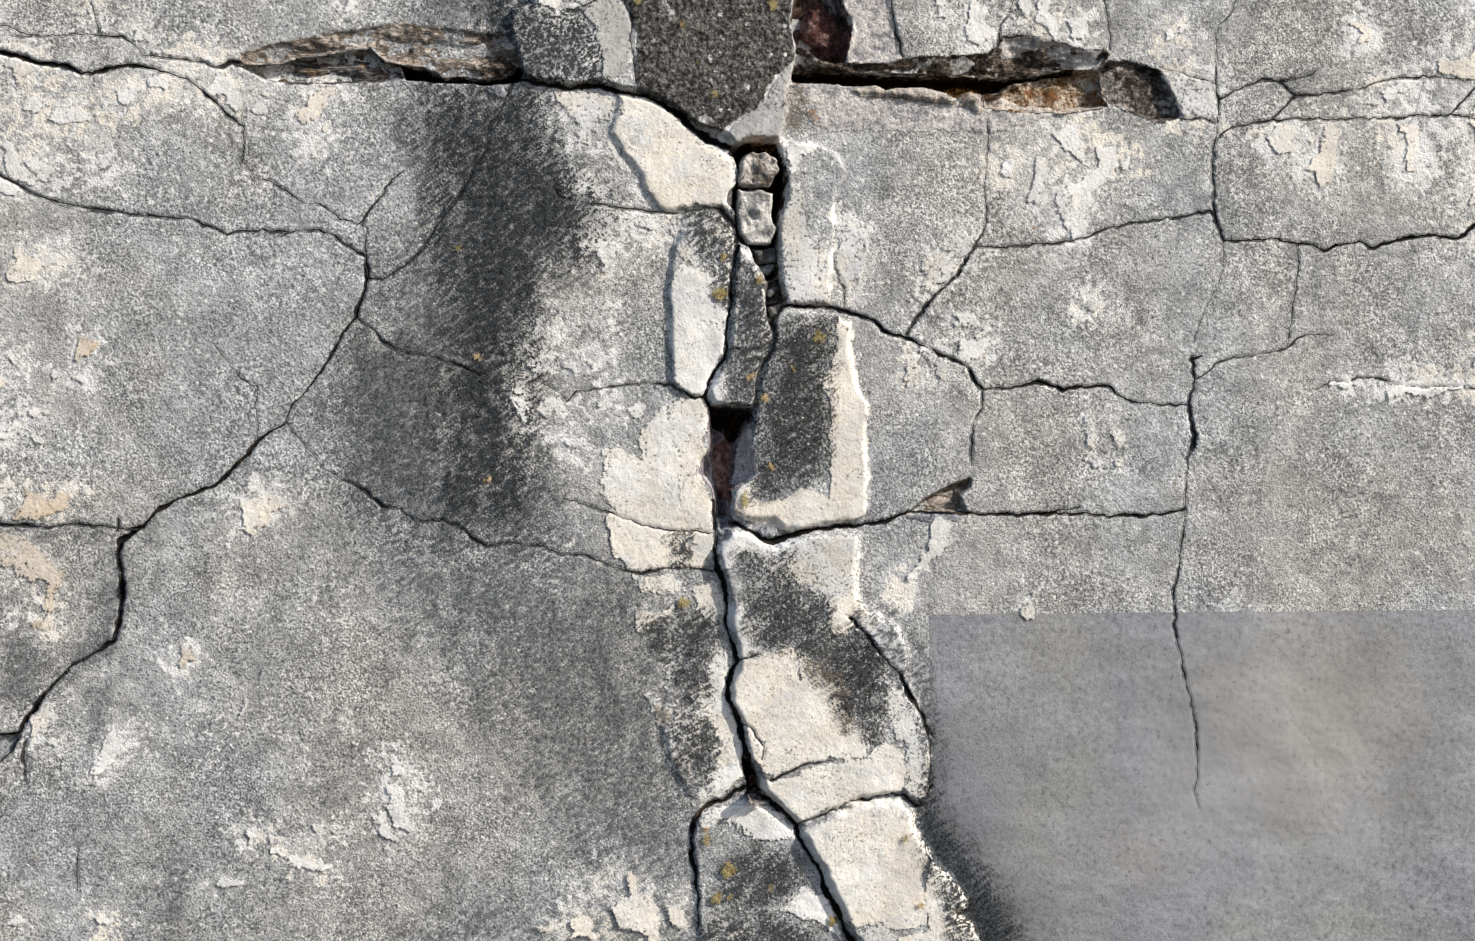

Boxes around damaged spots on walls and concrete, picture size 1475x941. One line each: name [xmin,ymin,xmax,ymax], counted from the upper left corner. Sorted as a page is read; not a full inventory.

peeling [0,41,103,125]
peeling [116,76,172,105]
spalling [134,21,524,158]
water stain [412,0,537,43]
spalling [538,0,1219,242]
peeling [567,234,621,271]
spalling [765,276,787,319]
crack [732,0,1475,807]
crack [0,0,934,941]
water stain [299,63,1028,941]
spalling [699,406,760,537]
spalling [760,523,777,535]